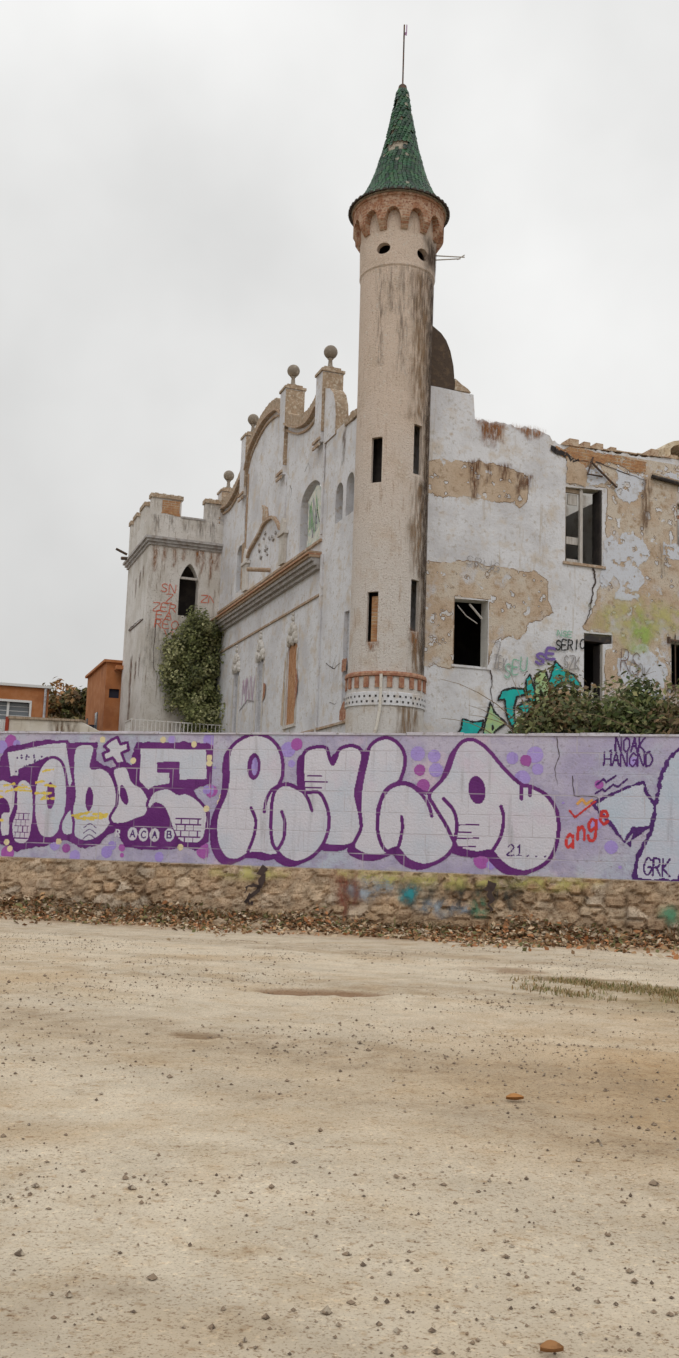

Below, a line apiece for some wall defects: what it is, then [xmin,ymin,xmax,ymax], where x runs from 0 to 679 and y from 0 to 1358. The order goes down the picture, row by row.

peeling [428,459,529,508]
peeling [424,560,554,669]
peeling [551,445,679,706]